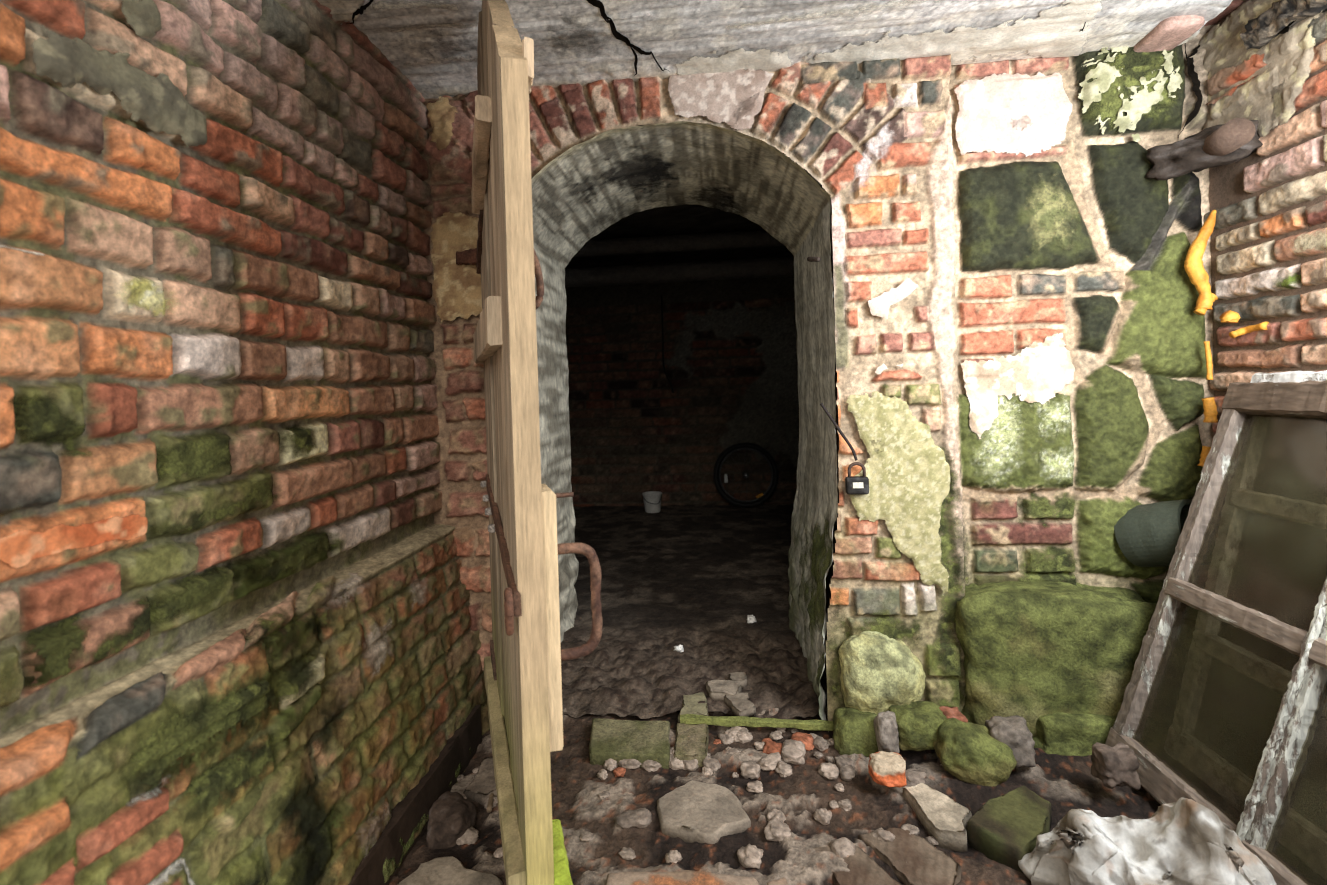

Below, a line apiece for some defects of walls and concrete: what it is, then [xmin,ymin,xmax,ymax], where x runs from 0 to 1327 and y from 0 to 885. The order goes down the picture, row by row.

crack [346,0,373,24]
crack [587,0,670,76]
flaking render [868,278,918,319]
flaking render [960,333,1075,439]
flaking render [846,391,950,596]
leakage [362,627,392,673]
leakage [317,688,352,748]
leakage [281,777,332,885]
leakage [149,859,193,885]